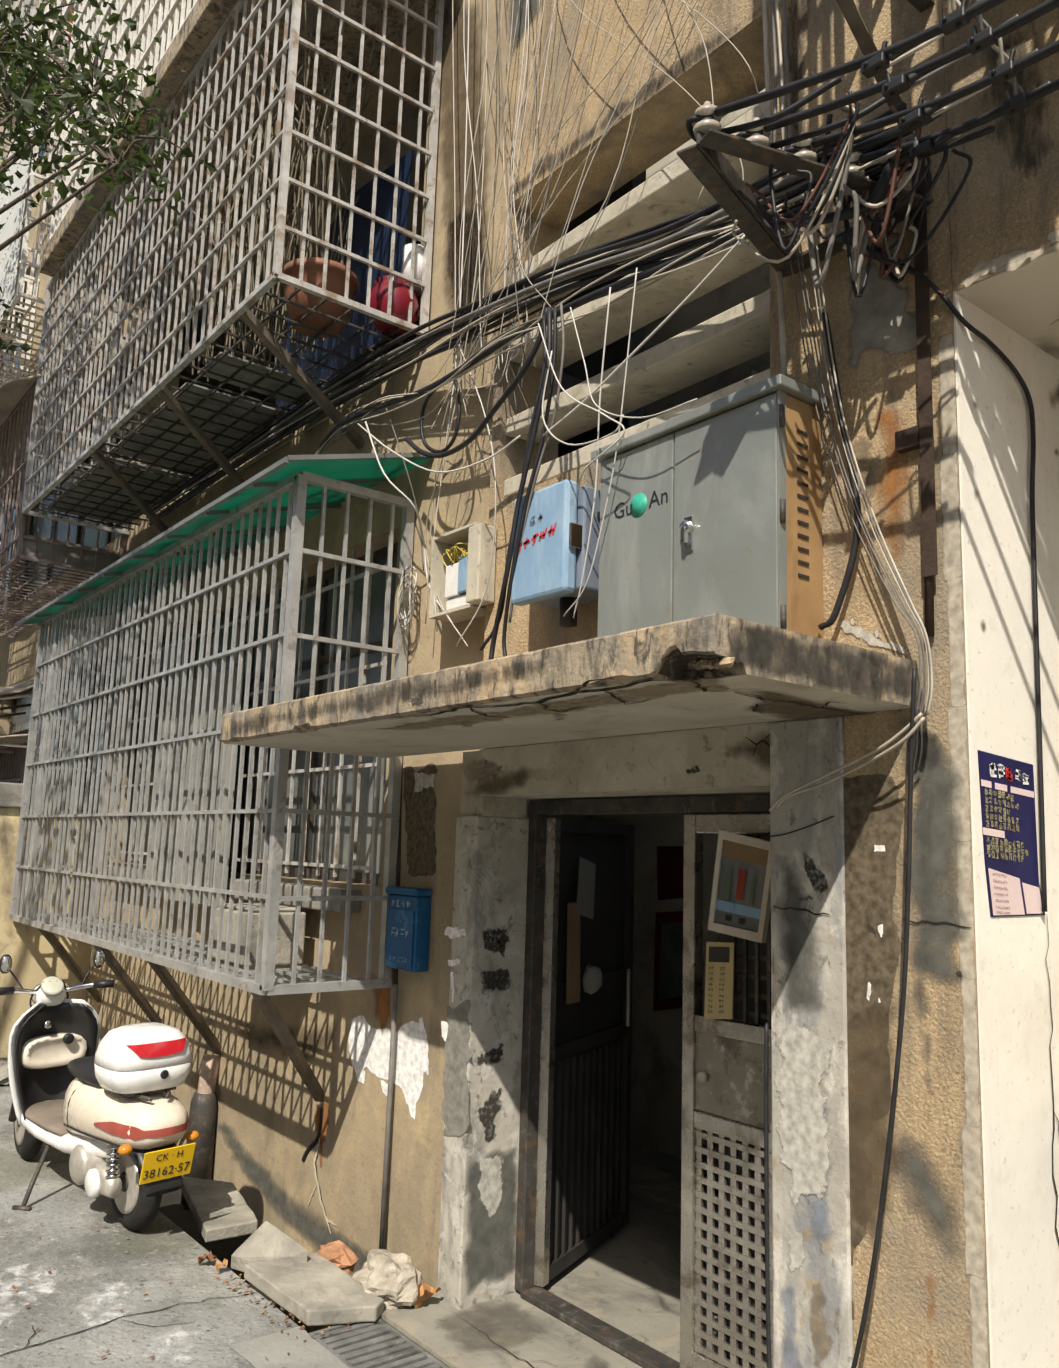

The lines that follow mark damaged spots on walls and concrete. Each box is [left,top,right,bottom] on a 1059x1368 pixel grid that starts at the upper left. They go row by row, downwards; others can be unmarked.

leakage [230,659,543,735]
peeling [383,649,737,730]
spalling [801,854,828,900]
leakage [847,333,989,1368]
peeling [445,926,466,939]
flaking render [843,774,905,1113]
peeling [441,958,503,1217]
peeling [774,1023,834,1208]
crack [1046,919,1059,1242]
peeling [787,1231,806,1272]
flaking render [850,1171,867,1265]
peeling [810,1285,854,1365]